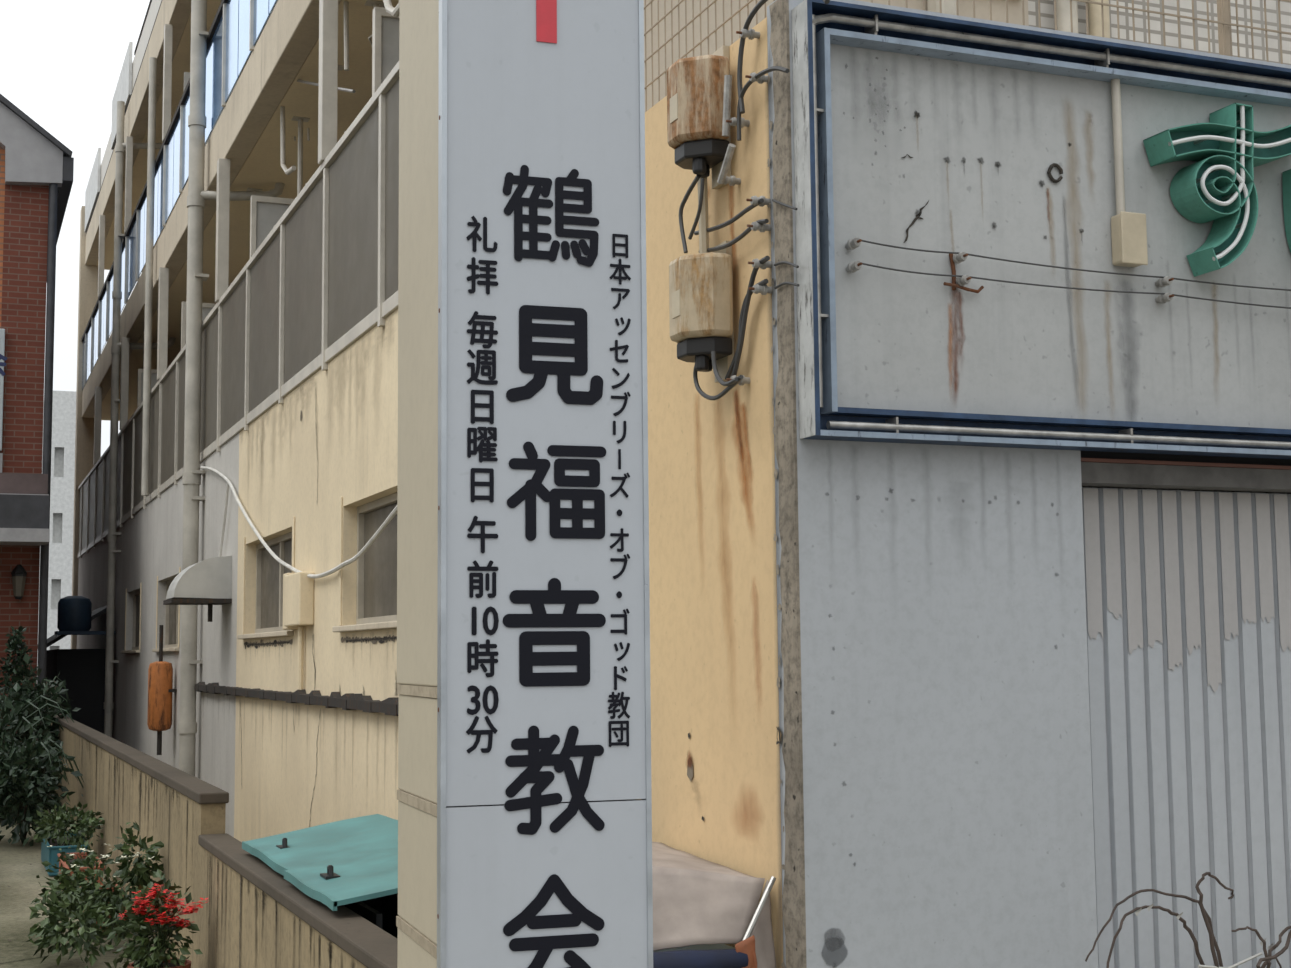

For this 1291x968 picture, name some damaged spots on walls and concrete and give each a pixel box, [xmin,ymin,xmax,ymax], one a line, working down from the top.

rust [950,290,963,391]
rust [735,399,749,499]
water stain [293,918,353,968]